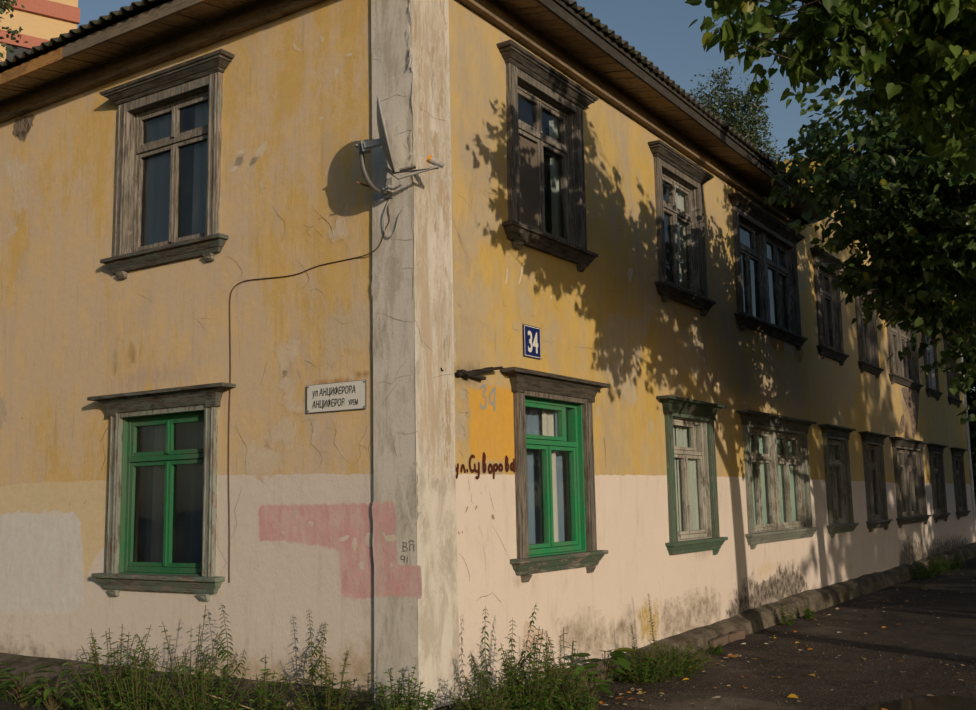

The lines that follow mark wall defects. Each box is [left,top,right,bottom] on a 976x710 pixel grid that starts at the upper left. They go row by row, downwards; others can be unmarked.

peeling [599,282,658,409]
damp [898,533,972,566]
damp [554,603,641,668]
damp [657,559,809,641]